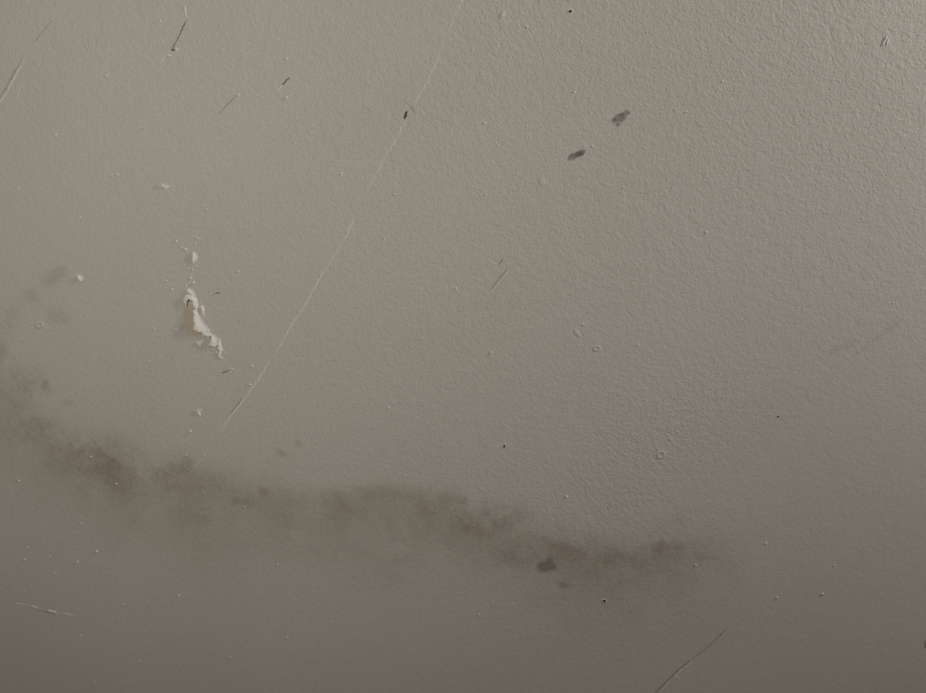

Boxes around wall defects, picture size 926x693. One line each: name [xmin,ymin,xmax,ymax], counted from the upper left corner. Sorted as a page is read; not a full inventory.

peeling [175,235,225,359]